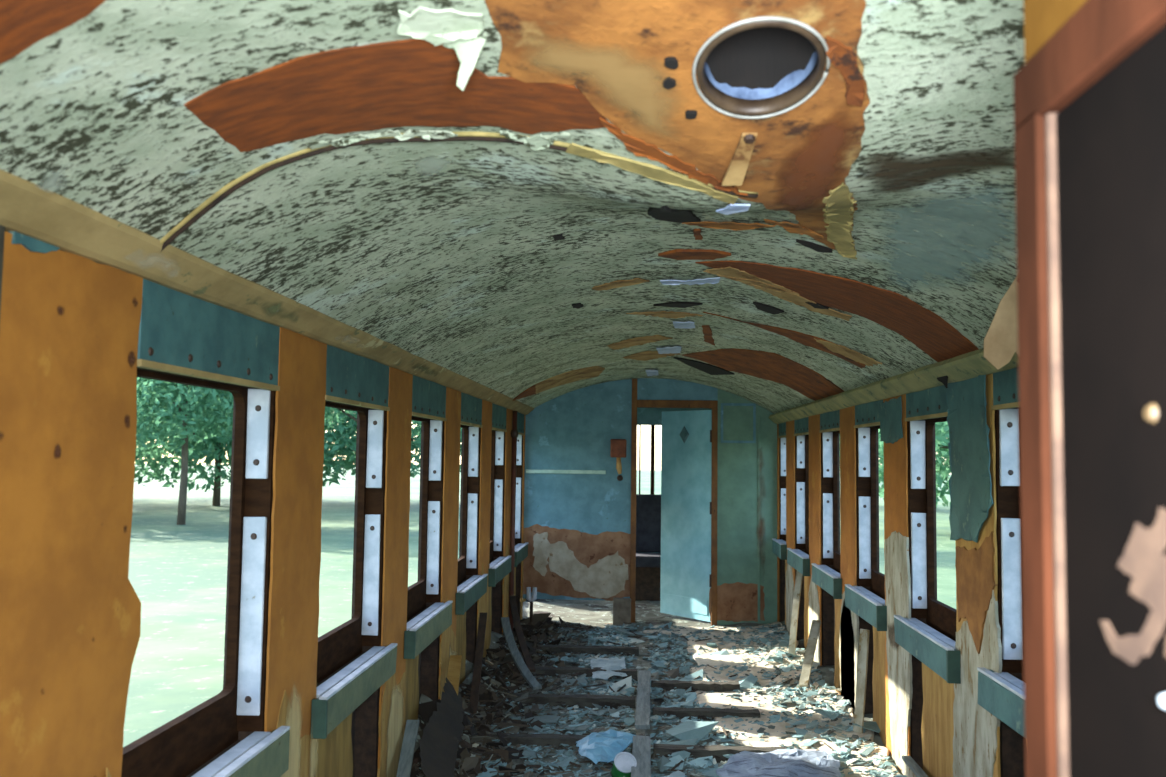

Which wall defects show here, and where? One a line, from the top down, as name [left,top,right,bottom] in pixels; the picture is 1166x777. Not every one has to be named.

peeling [184,6,607,152]
peeling [682,204,824,239]
peeling [607,311,882,401]
peeling [592,260,979,362]
peeling [523,524,630,601]
flaking render [946,375,1002,777]
peeling [1099,507,1166,665]